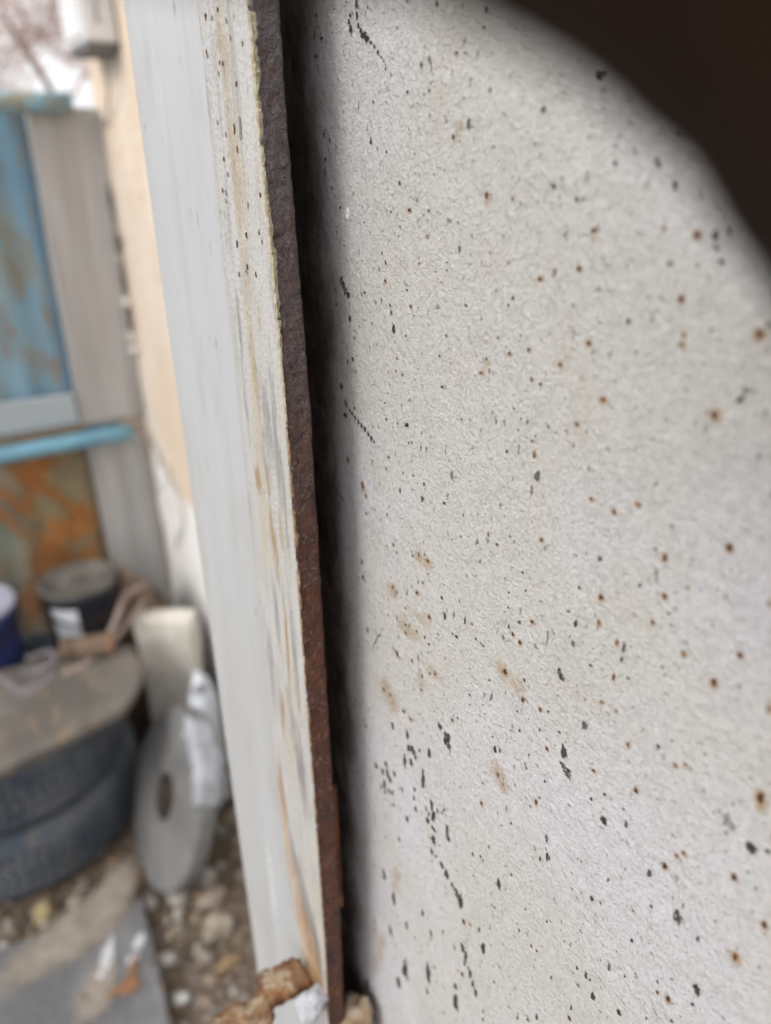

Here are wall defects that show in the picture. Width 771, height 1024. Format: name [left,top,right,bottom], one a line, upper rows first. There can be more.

rust [279,0,360,998]